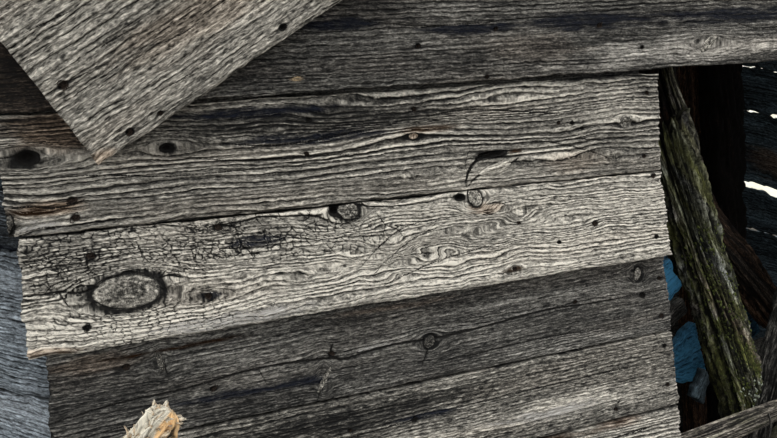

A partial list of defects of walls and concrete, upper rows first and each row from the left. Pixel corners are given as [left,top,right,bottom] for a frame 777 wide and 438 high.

crack [519,138,610,159]
crack [465,150,517,208]
crack [2,241,198,331]